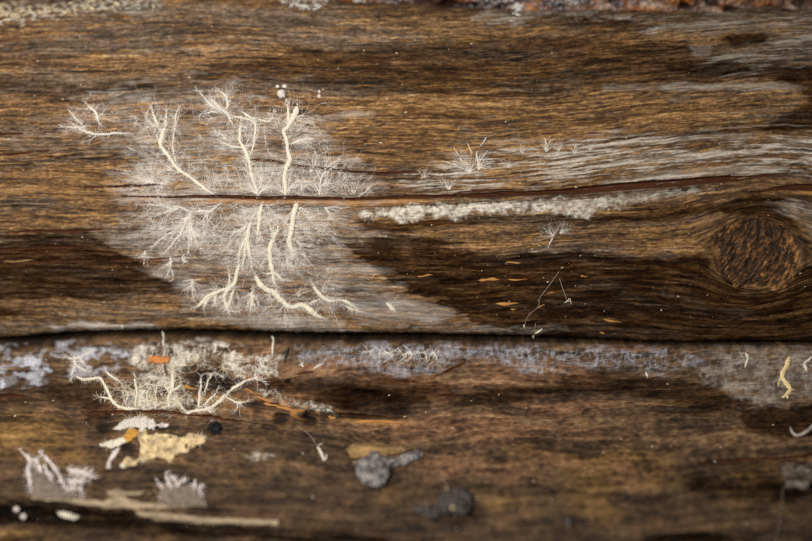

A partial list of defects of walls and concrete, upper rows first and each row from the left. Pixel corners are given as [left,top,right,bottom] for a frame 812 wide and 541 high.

crack [250,158,412,176]
crack [84,167,812,201]
water stain [0,78,812,410]